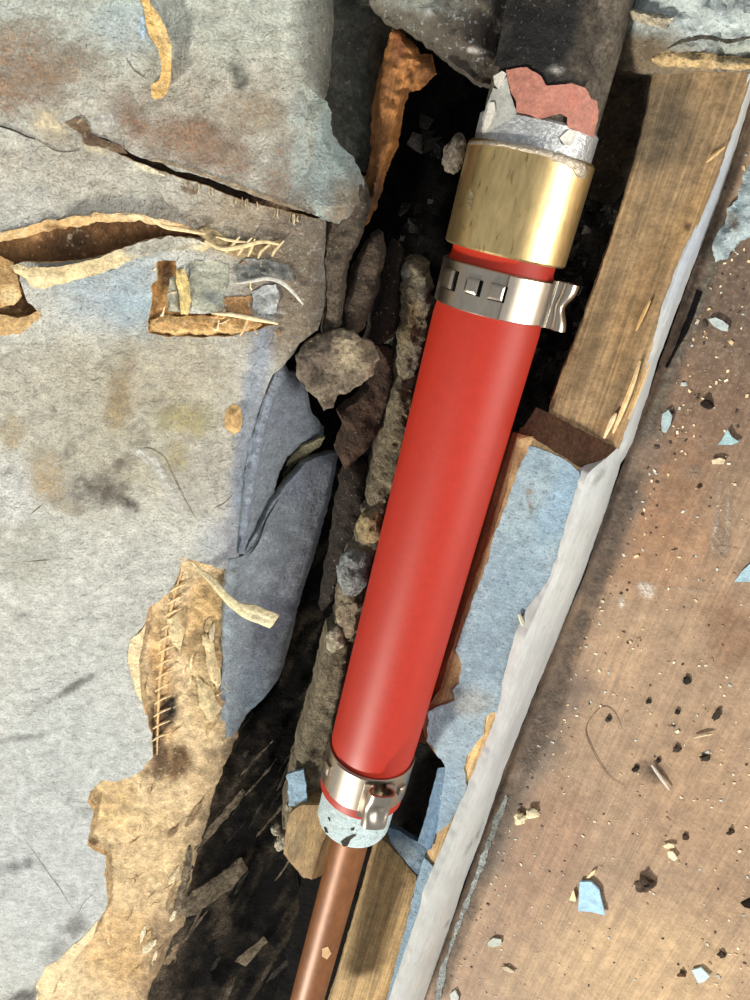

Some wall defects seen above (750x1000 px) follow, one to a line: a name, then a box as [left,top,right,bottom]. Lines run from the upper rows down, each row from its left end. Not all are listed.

crack [0,117,320,224]
peeling [36,556,279,1000]